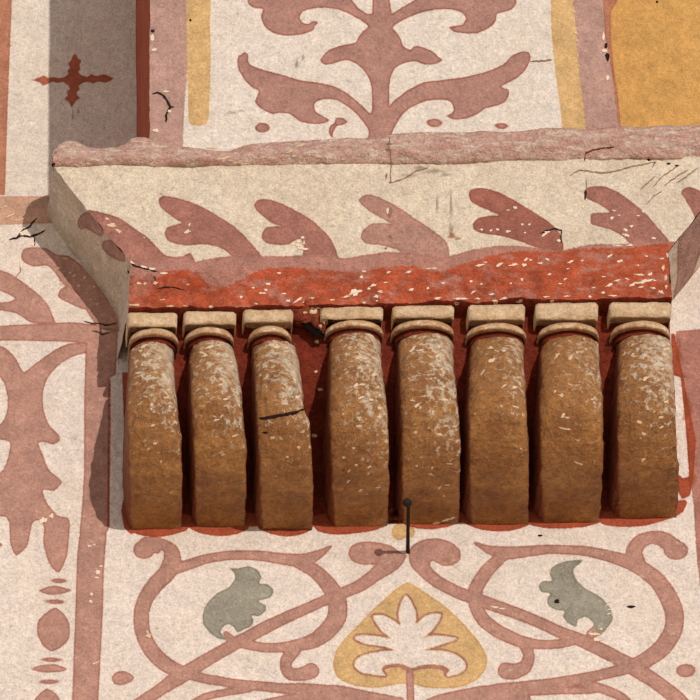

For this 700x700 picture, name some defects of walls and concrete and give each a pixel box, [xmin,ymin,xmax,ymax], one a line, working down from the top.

crack [152,90,174,133]
crack [385,137,427,184]
crack [570,147,656,208]
crack [9,218,45,277]
crack [540,228,562,243]
peeling [330,271,391,302]
peeling [588,253,669,298]
crack [259,409,304,434]